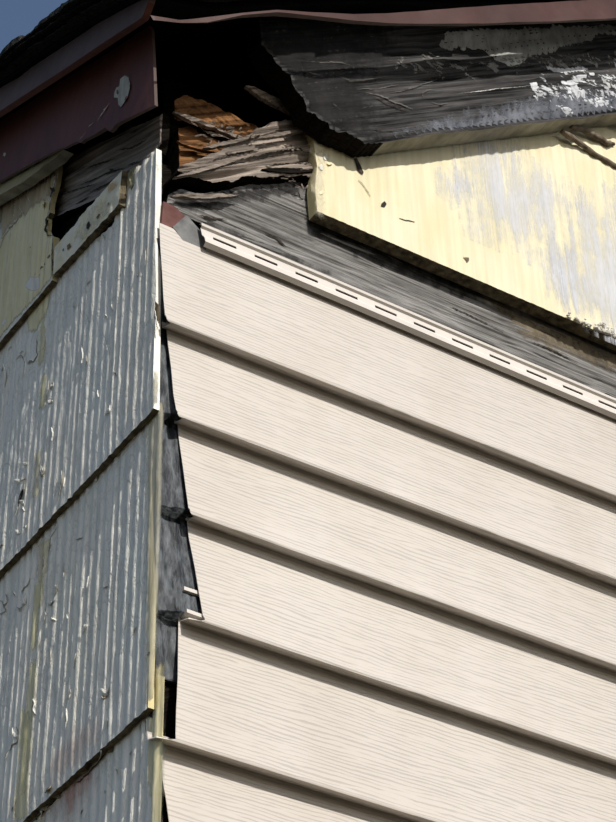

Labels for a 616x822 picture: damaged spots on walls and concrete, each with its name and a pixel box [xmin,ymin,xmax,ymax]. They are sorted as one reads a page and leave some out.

peeling [114,75,130,107]
peeling [392,24,616,116]
leakage [176,182,308,209]
peeling [0,175,57,364]
leakage [203,221,300,263]
leakage [309,221,480,300]
leakage [493,302,616,368]
peeling [14,452,45,516]
peeling [13,664,65,822]
peeling [74,746,114,786]